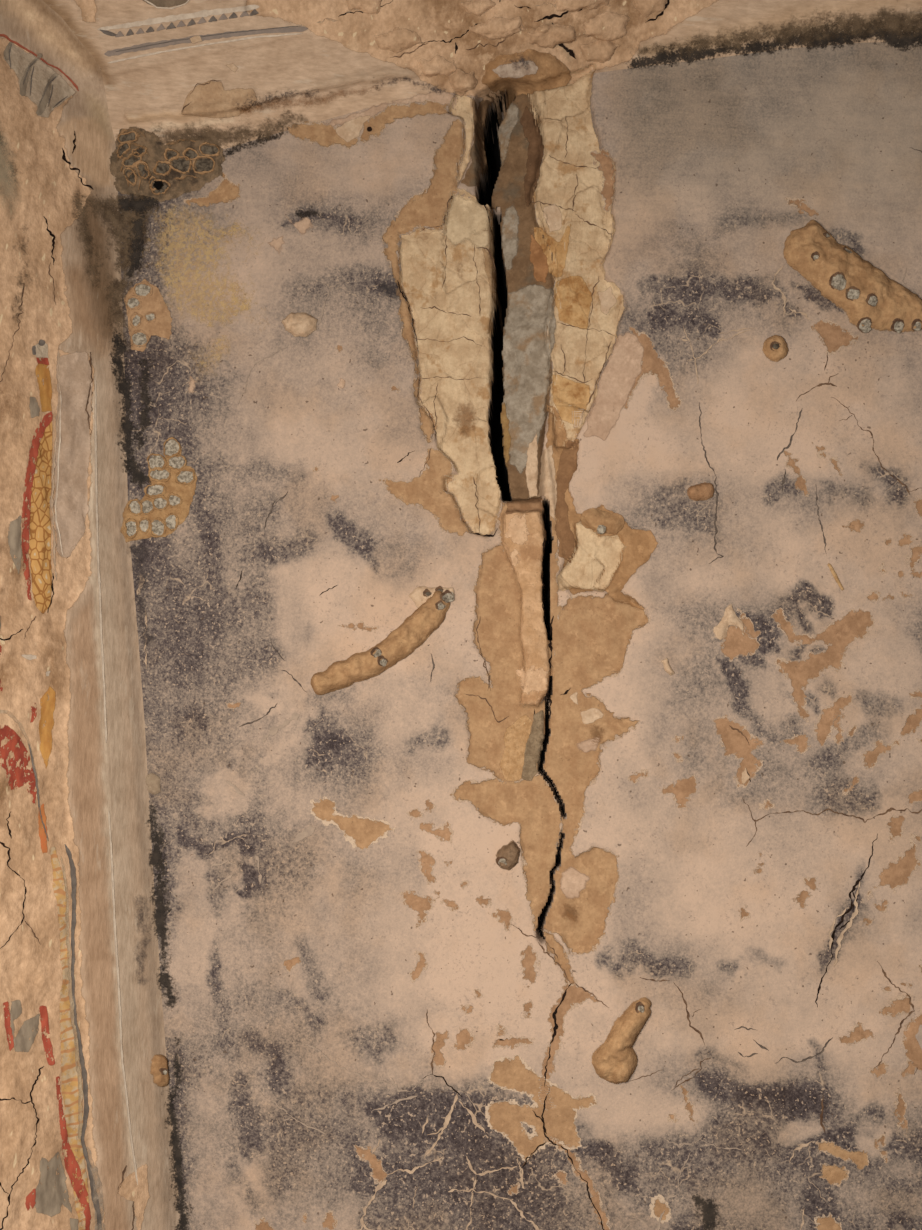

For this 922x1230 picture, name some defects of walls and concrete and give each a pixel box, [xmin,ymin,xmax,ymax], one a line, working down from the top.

leakage [107,195,147,346]
leakage [134,360,153,449]
crack [477,92,515,501]
peeling [811,319,861,356]
flaking render [0,38,105,1230]
flaking render [246,0,718,1230]
peeling [712,714,764,788]
crack [303,500,741,1230]
crack [742,797,922,1007]
leakage [170,1037,183,1101]
crack [734,1026,833,1063]
peeling [814,1213,842,1230]